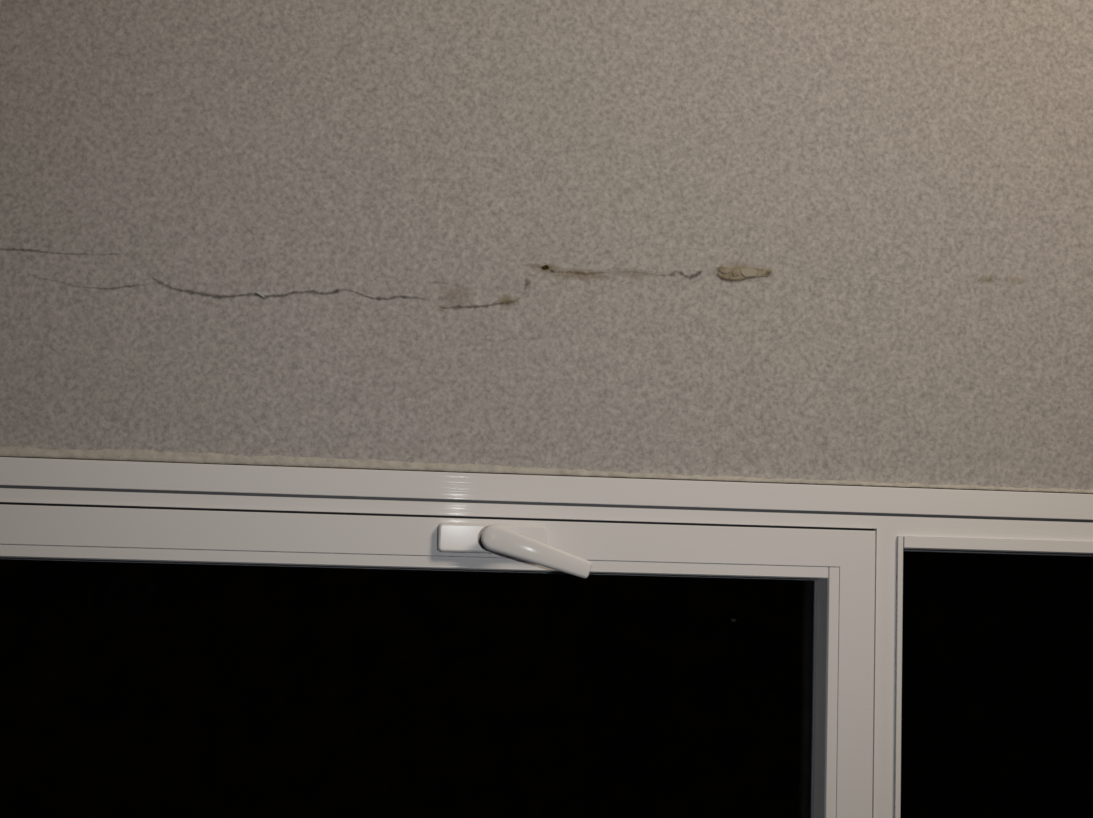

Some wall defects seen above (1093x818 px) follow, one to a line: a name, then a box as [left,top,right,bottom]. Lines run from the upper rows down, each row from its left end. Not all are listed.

peeling [717,266,772,281]